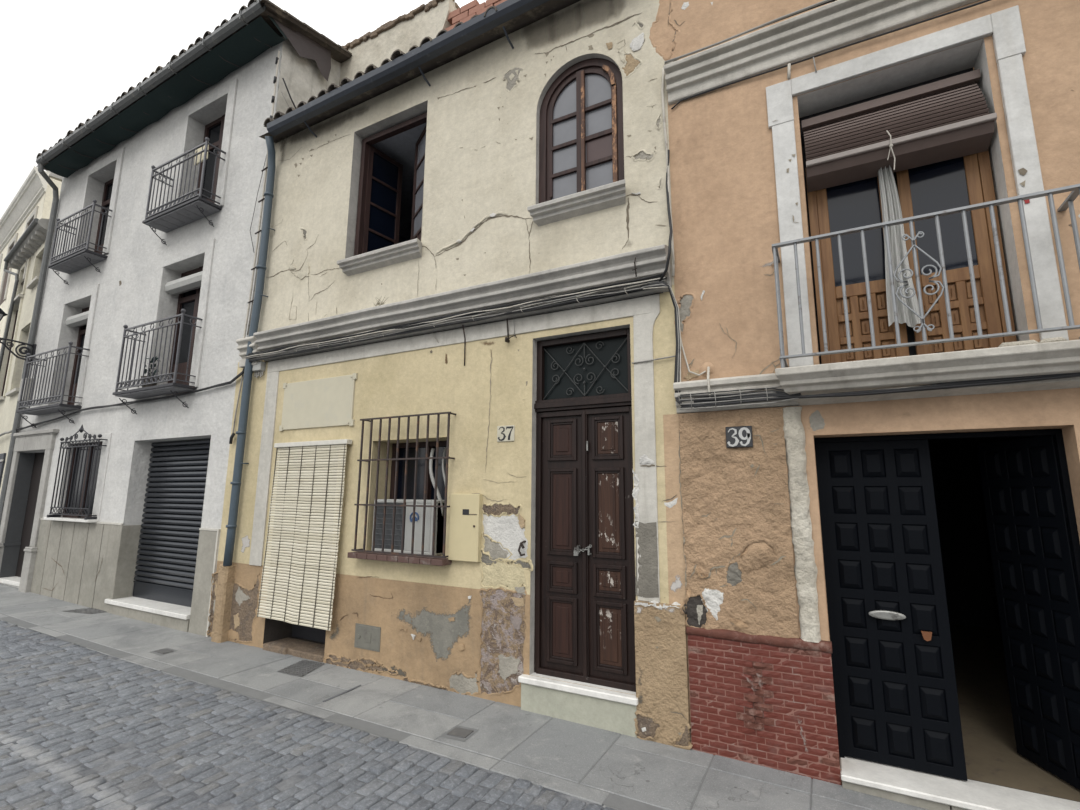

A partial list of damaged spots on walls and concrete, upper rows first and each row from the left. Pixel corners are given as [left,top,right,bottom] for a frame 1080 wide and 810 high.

peeling [606,0,689,78]
crack [271,219,339,321]
crack [417,211,533,295]
peeling [632,454,659,598]
peeling [228,573,261,643]
peeling [398,587,529,697]
spalling [679,588,724,628]